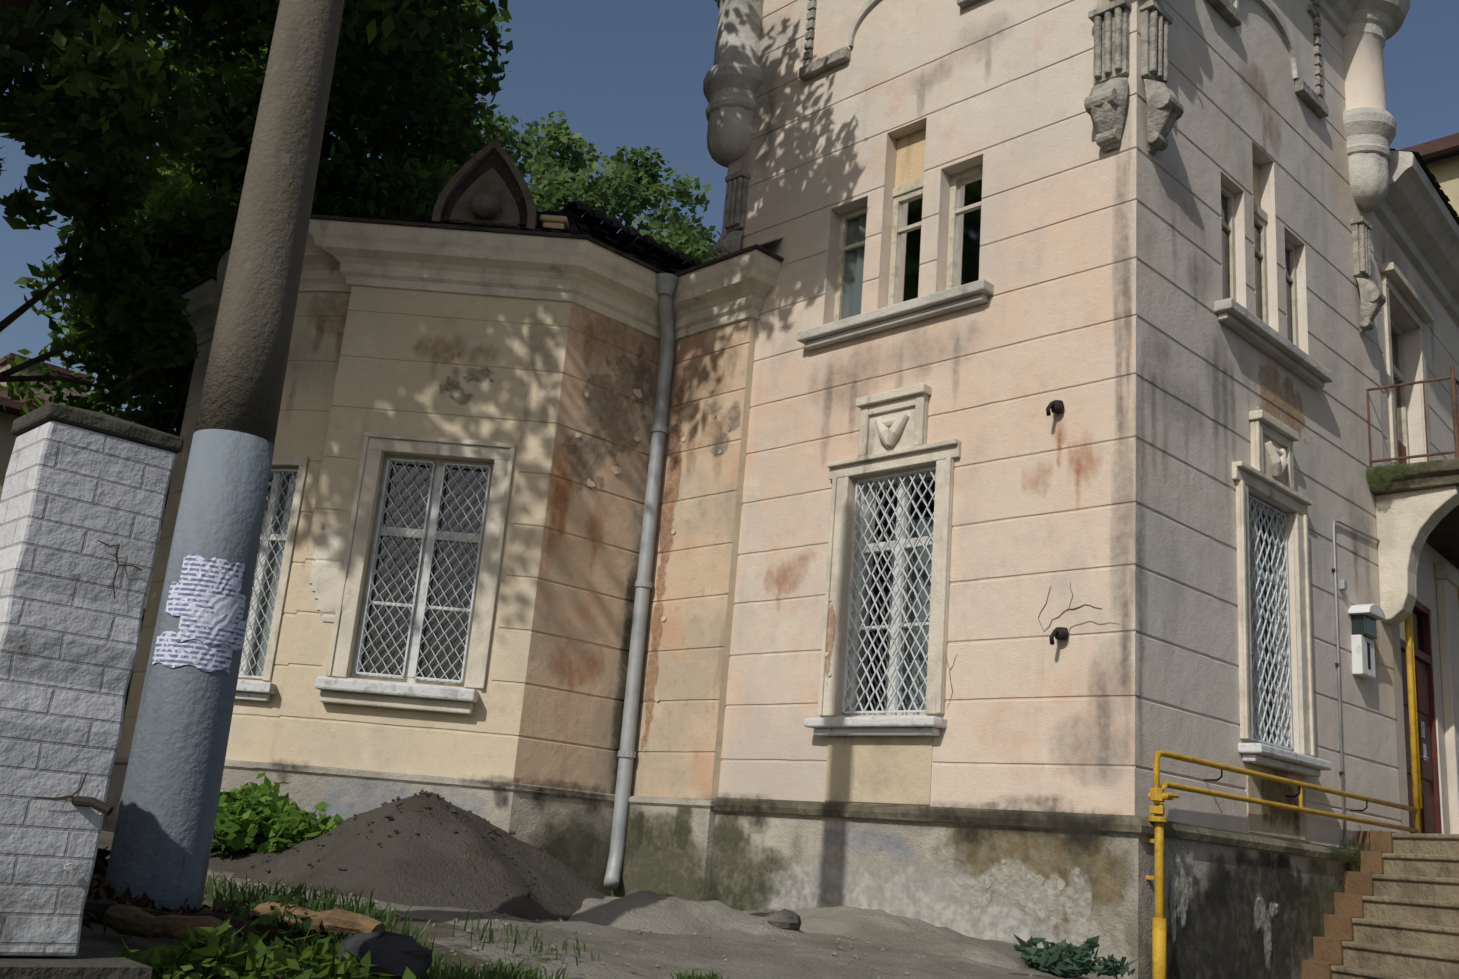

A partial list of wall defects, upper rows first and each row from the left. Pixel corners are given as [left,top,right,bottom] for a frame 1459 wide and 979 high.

peeling [440,367,494,404]
spalling [566,355,653,489]
spalling [708,401,739,456]
peeling [1257,362,1306,440]
flaking render [642,382,686,752]
crack [1038,586,1117,634]
damp [612,570,638,791]
damp [536,801,1126,948]
peeling [950,859,1091,947]
damp [1166,851,1361,979]